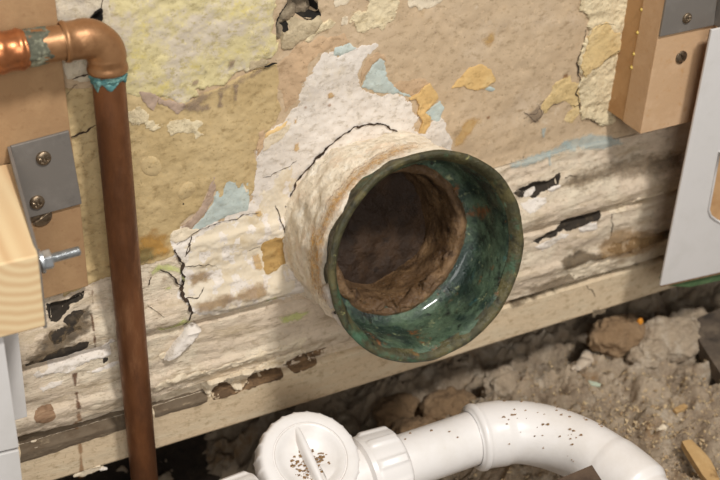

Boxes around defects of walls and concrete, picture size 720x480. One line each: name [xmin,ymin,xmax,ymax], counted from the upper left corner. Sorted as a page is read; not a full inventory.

spalling [541,0,627,126]
peeling [25,59,119,392]
crack [149,213,257,325]
peeling [55,0,452,361]
crack [268,123,397,233]
spalling [514,173,561,214]
spalling [533,187,678,251]
peeling [200,348,325,400]